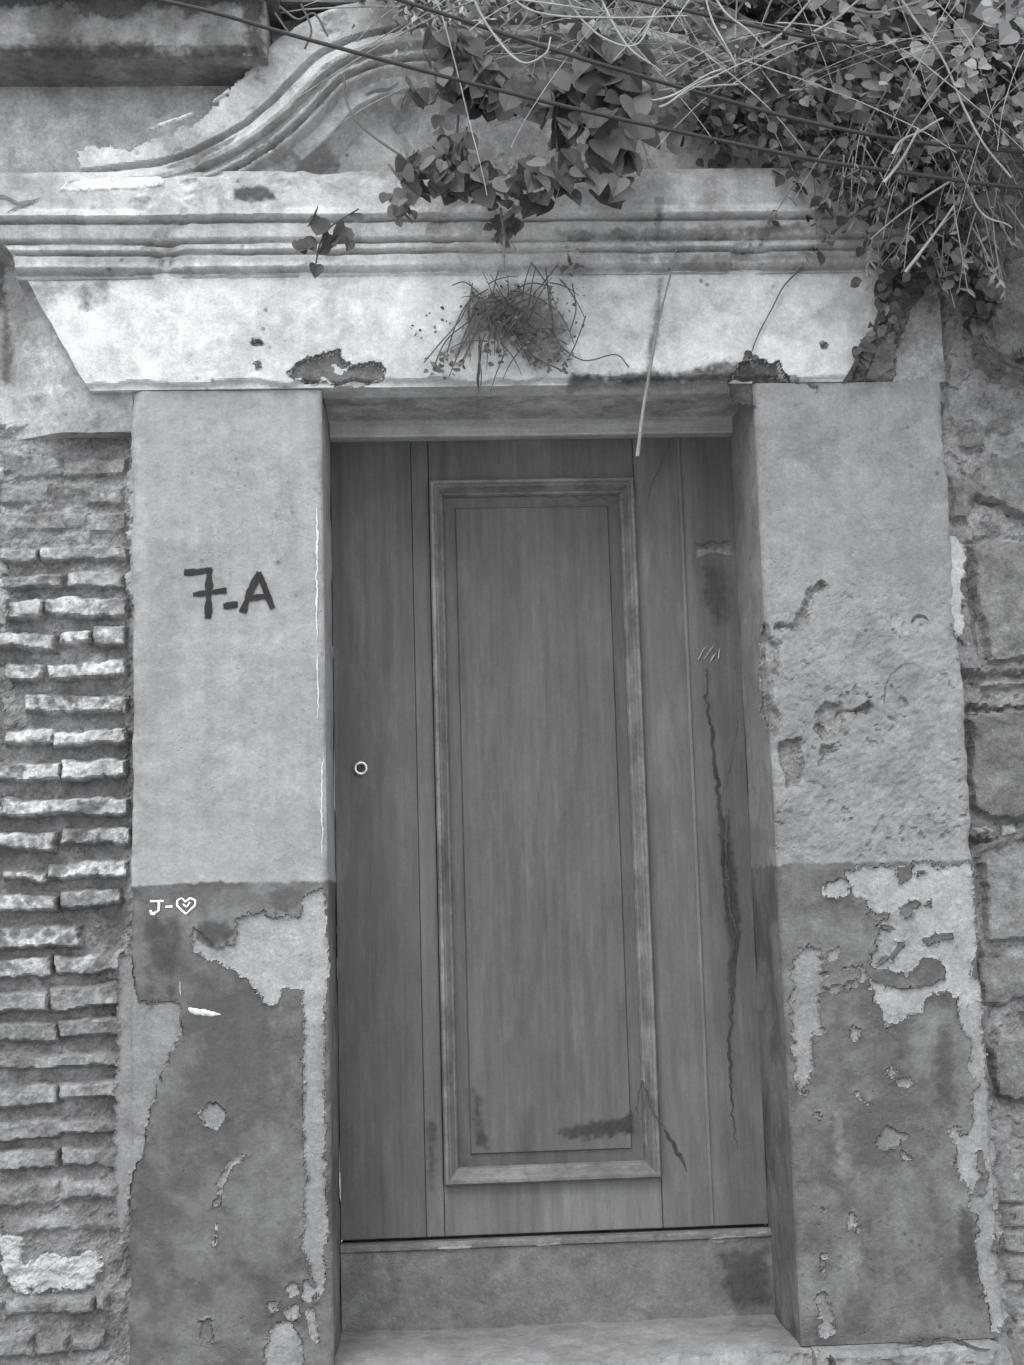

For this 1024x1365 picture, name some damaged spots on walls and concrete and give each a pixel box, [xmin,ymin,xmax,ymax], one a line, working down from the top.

flaking render [146,111,194,132]
flaking render [286,348,387,389]
flaking render [726,359,795,407]
flaking render [758,580,874,788]
flaking render [0,427,225,1365]
peeling [191,889,331,1365]
peeling [787,860,1009,1333]
peeling [811,1253,836,1365]
crack [897,1336,991,1361]